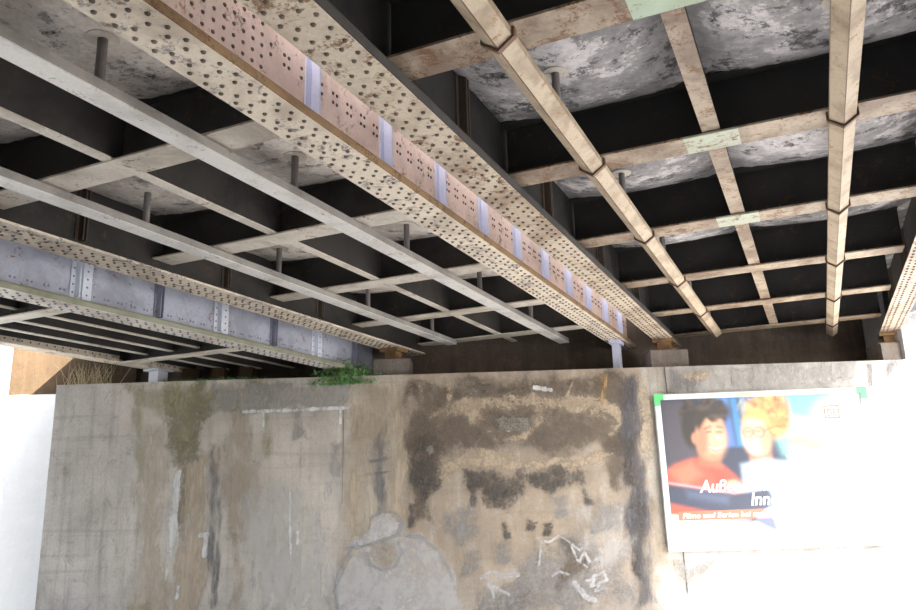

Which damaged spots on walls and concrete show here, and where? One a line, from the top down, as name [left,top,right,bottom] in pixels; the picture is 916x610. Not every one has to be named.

leakage [164,381,350,606]
leakage [410,375,664,605]